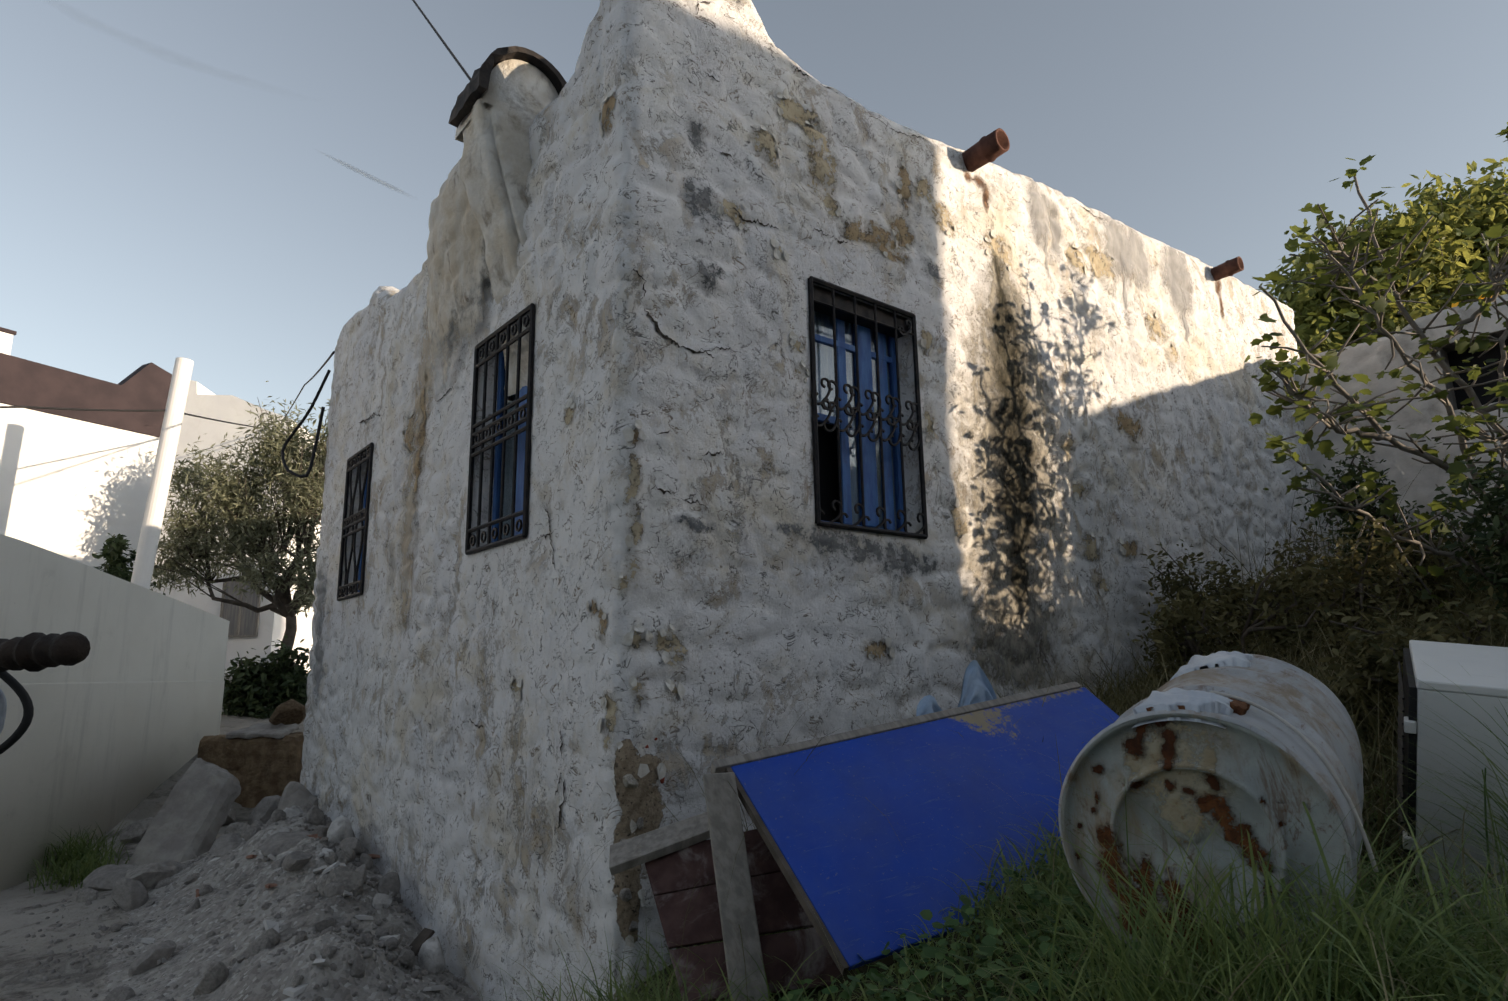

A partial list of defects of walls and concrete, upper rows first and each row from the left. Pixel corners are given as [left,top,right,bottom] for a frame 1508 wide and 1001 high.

corrosion [965,171,989,212]
leakage [1030,182,1061,270]
crack [633,269,738,358]
leakage [1104,219,1192,342]
leakage [956,251,1067,691]
spalling [596,676,667,844]
spalling [612,865,646,947]